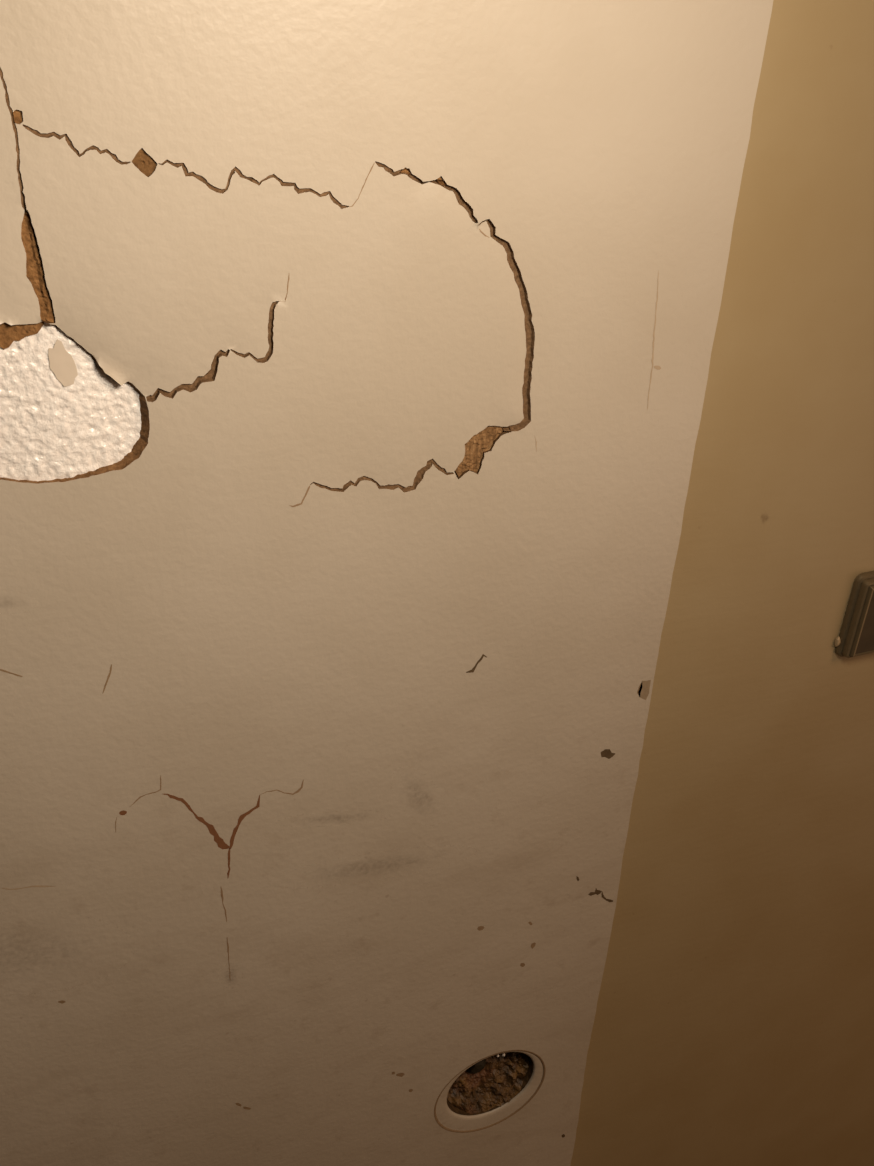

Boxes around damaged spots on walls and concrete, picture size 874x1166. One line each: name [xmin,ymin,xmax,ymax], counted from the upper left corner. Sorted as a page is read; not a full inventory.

crack [0,68,130,323]
crack [146,160,535,431]
spalling [0,321,150,484]
crack [289,459,454,507]
crack [115,776,304,978]